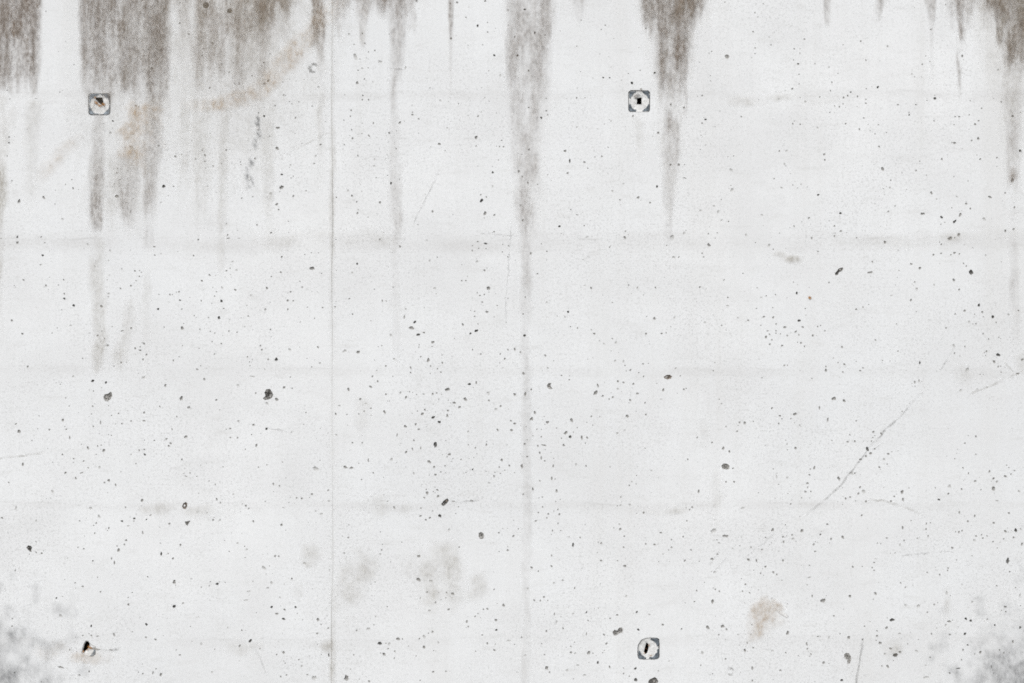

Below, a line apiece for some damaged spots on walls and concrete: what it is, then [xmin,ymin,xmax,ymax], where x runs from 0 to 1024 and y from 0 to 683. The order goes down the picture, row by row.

damp [0,0,40,69]
damp [90,0,167,62]
damp [656,0,696,68]
damp [987,0,1024,58]